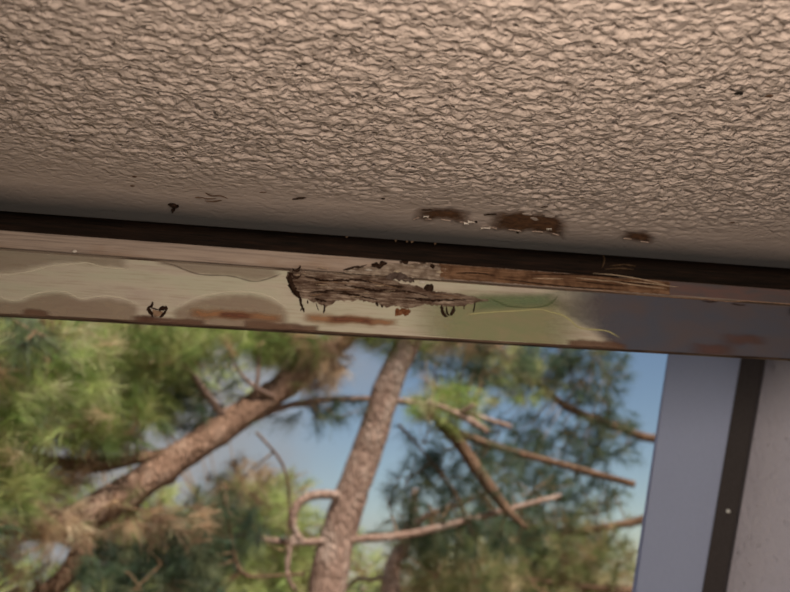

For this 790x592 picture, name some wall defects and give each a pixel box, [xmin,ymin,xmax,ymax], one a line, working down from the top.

flaking render [413,206,563,236]
flaking render [623,232,651,243]
peeling [395,308,411,316]